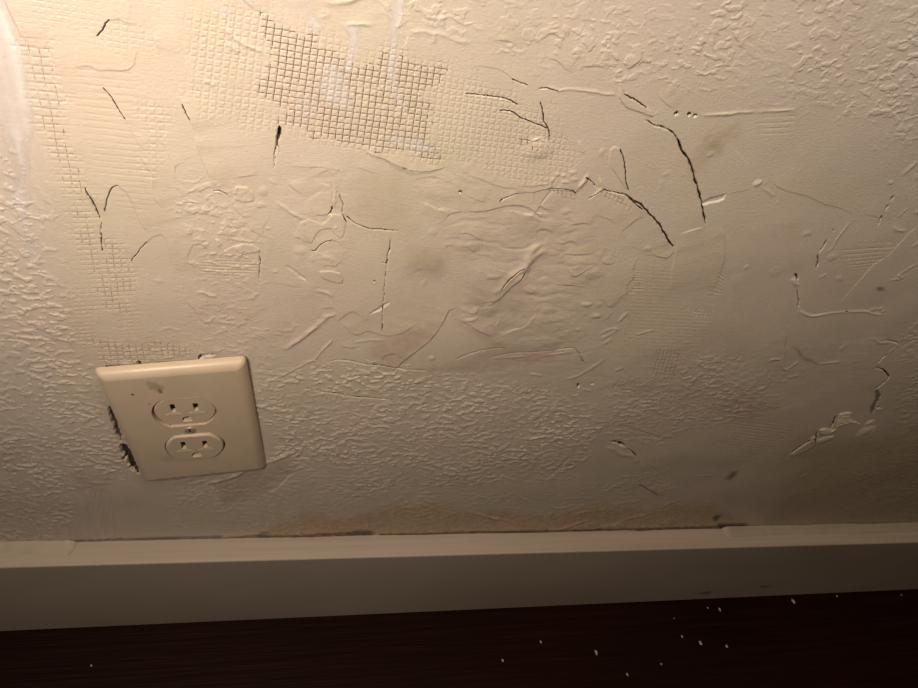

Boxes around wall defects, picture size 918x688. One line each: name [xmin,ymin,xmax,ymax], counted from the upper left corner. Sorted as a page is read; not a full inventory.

crack [273,125,281,161]
crack [466,52,797,228]
crack [63,128,110,251]
crack [340,198,395,276]
crack [603,189,675,258]
crack [870,343,899,413]
flaking render [791,411,877,456]